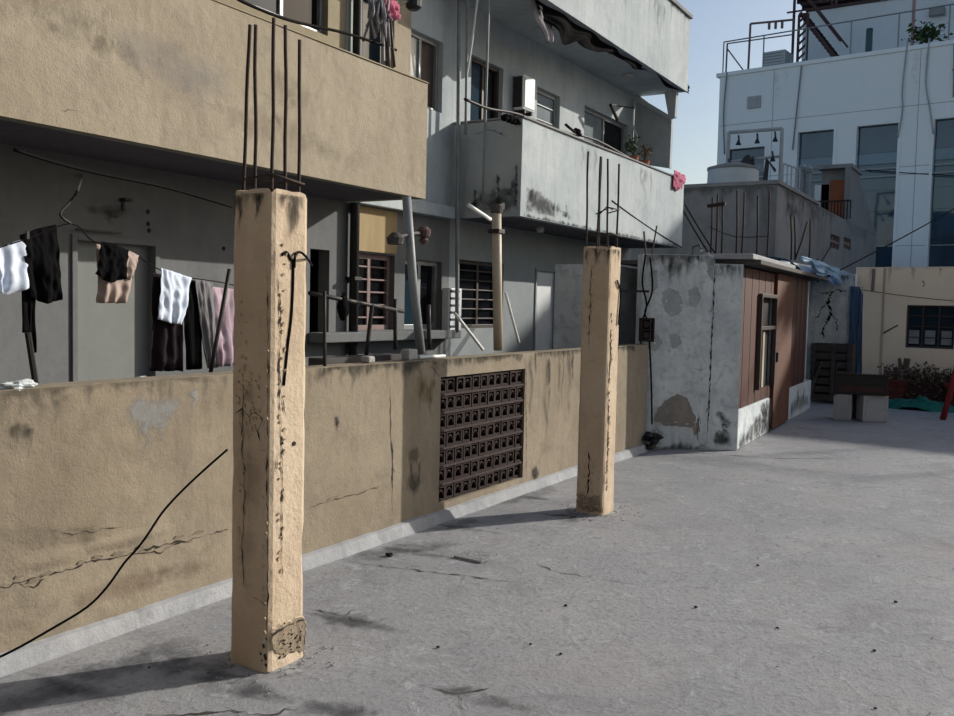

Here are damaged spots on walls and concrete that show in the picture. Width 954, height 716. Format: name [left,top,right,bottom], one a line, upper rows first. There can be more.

water stain [471,167,700,261]
spalling [735,190,745,253]
spalling [756,191,771,258]
peeling [644,194,724,317]
crack [816,289,846,338]
peeling [648,331,685,356]
crack [0,244,395,646]
spalling [650,394,701,444]
mould [715,413,728,444]
mould [740,402,772,447]
spalling [260,616,307,667]